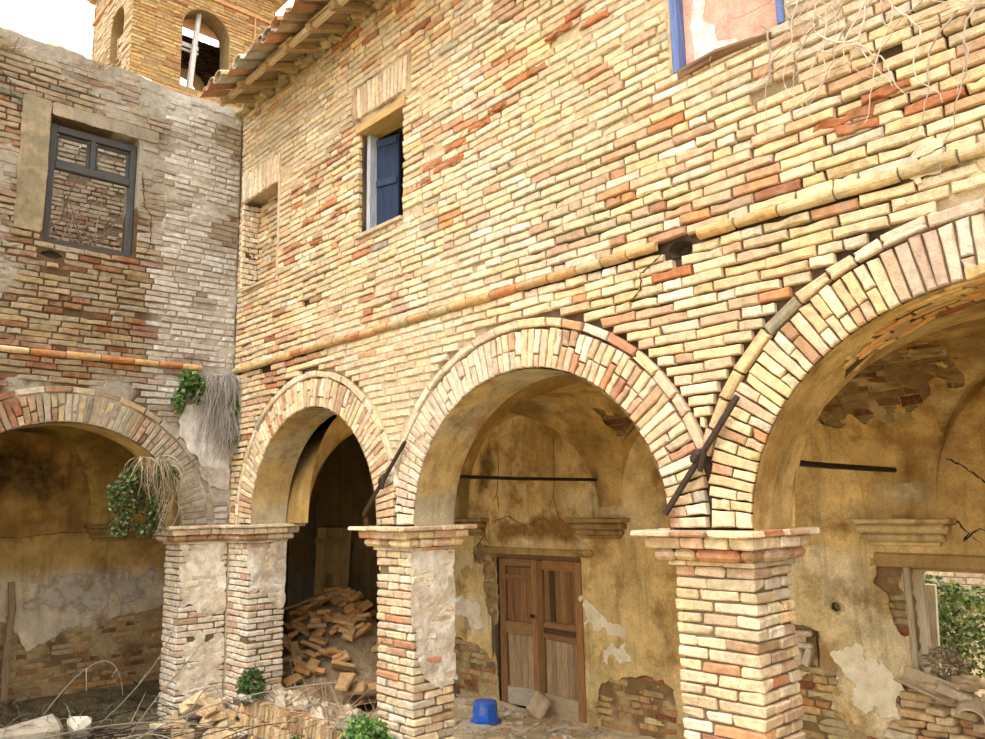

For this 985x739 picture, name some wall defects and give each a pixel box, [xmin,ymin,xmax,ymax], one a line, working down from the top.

flaking render [818,263,985,429]
flaking render [0,569,165,703]
peeling [179,543,228,619]
peeling [247,541,287,610]
peeling [406,542,500,701]
crack [472,436,573,563]
peeling [578,595,631,664]
flaking render [594,675,685,739]
peeling [793,624,915,739]
flaking render [869,557,921,651]
crack [944,456,985,483]
crack [951,521,985,545]